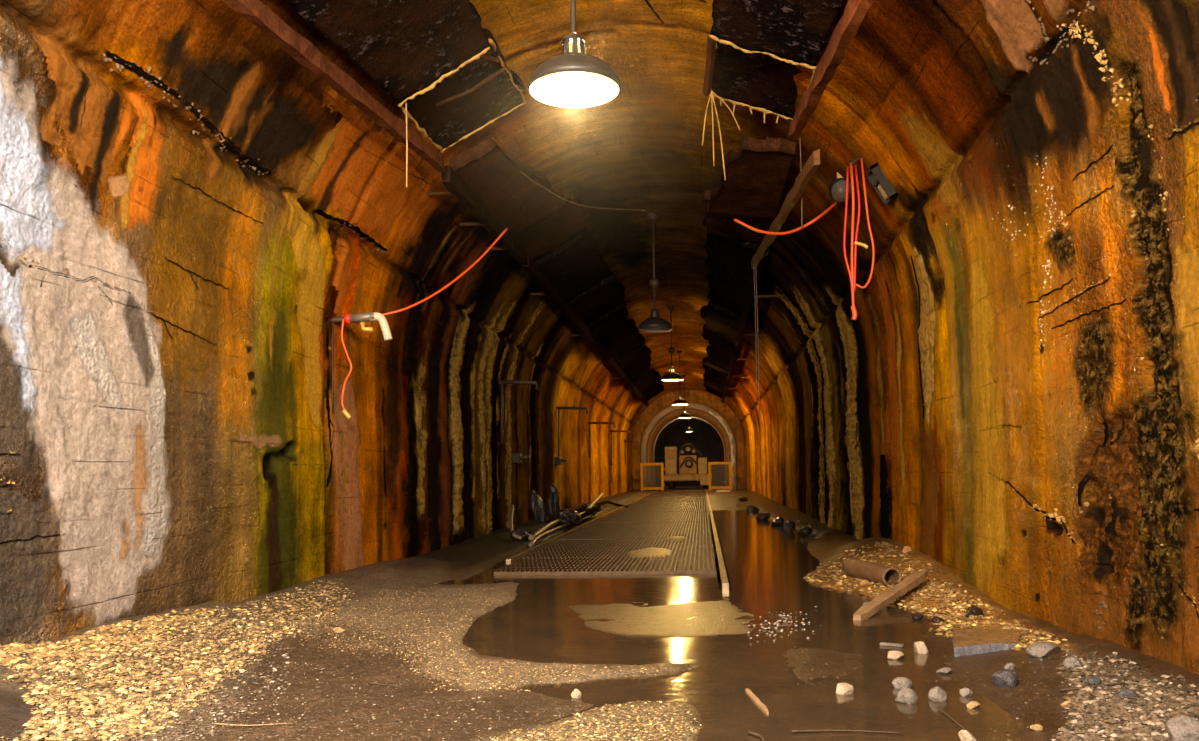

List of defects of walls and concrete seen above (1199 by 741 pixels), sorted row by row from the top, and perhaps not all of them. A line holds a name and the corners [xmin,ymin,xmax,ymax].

crack [1167,93,1199,140]
leakage [0,50,170,636]
crack [0,239,217,346]
crack [1027,273,1127,329]
leakage [1175,245,1199,417]
crack [0,451,65,544]
leakage [267,481,295,593]
crack [988,472,1076,544]